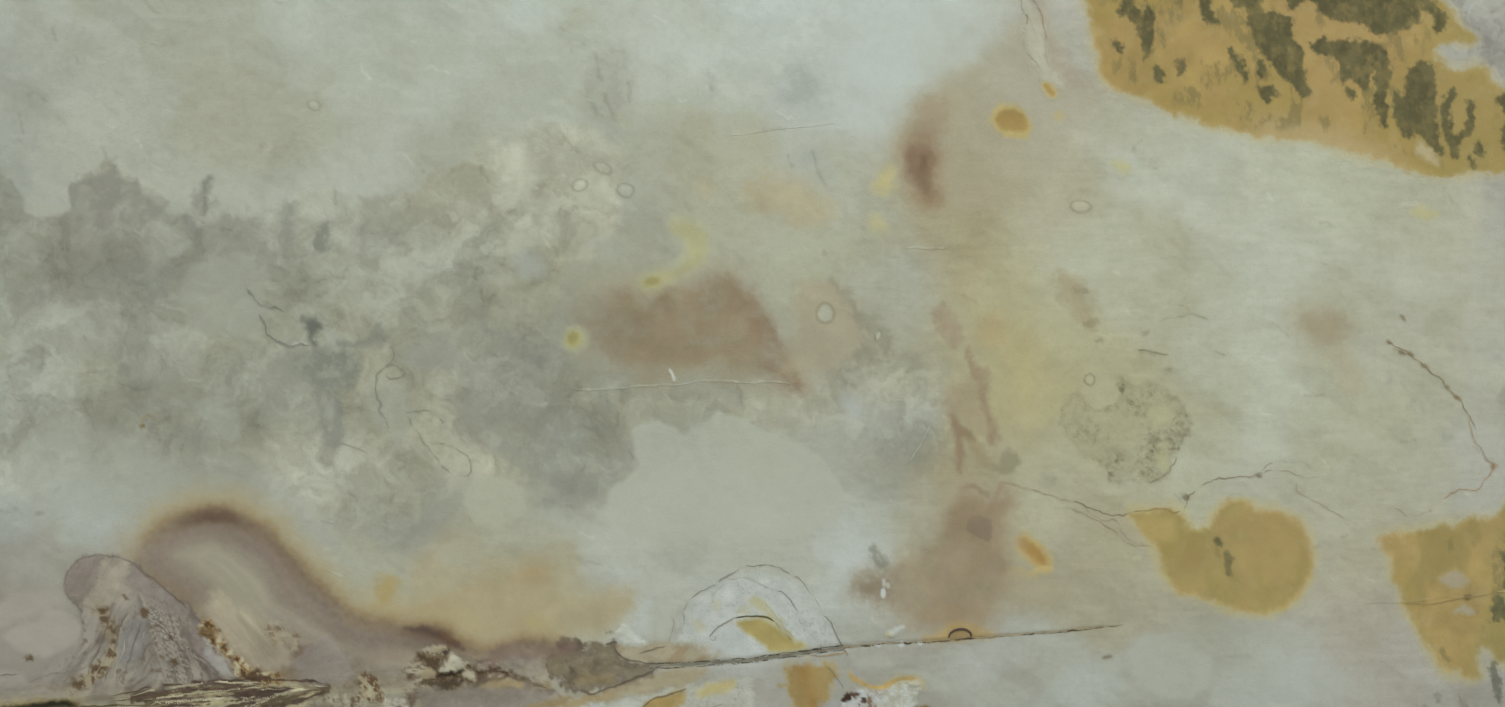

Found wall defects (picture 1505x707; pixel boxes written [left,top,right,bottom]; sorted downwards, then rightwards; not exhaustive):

damp [176,173,215,240]
damp [273,201,335,271]
damp [478,87,960,411]
damp [246,288,406,453]
crack [1385,314,1501,516]
crack [1002,459,1342,550]
flaking render [0,549,843,707]
crack [543,618,1120,697]
flaking render [815,686,921,707]
flaking render [879,577,892,600]
flaking render [948,628,972,638]
damp [1485,659,1505,707]